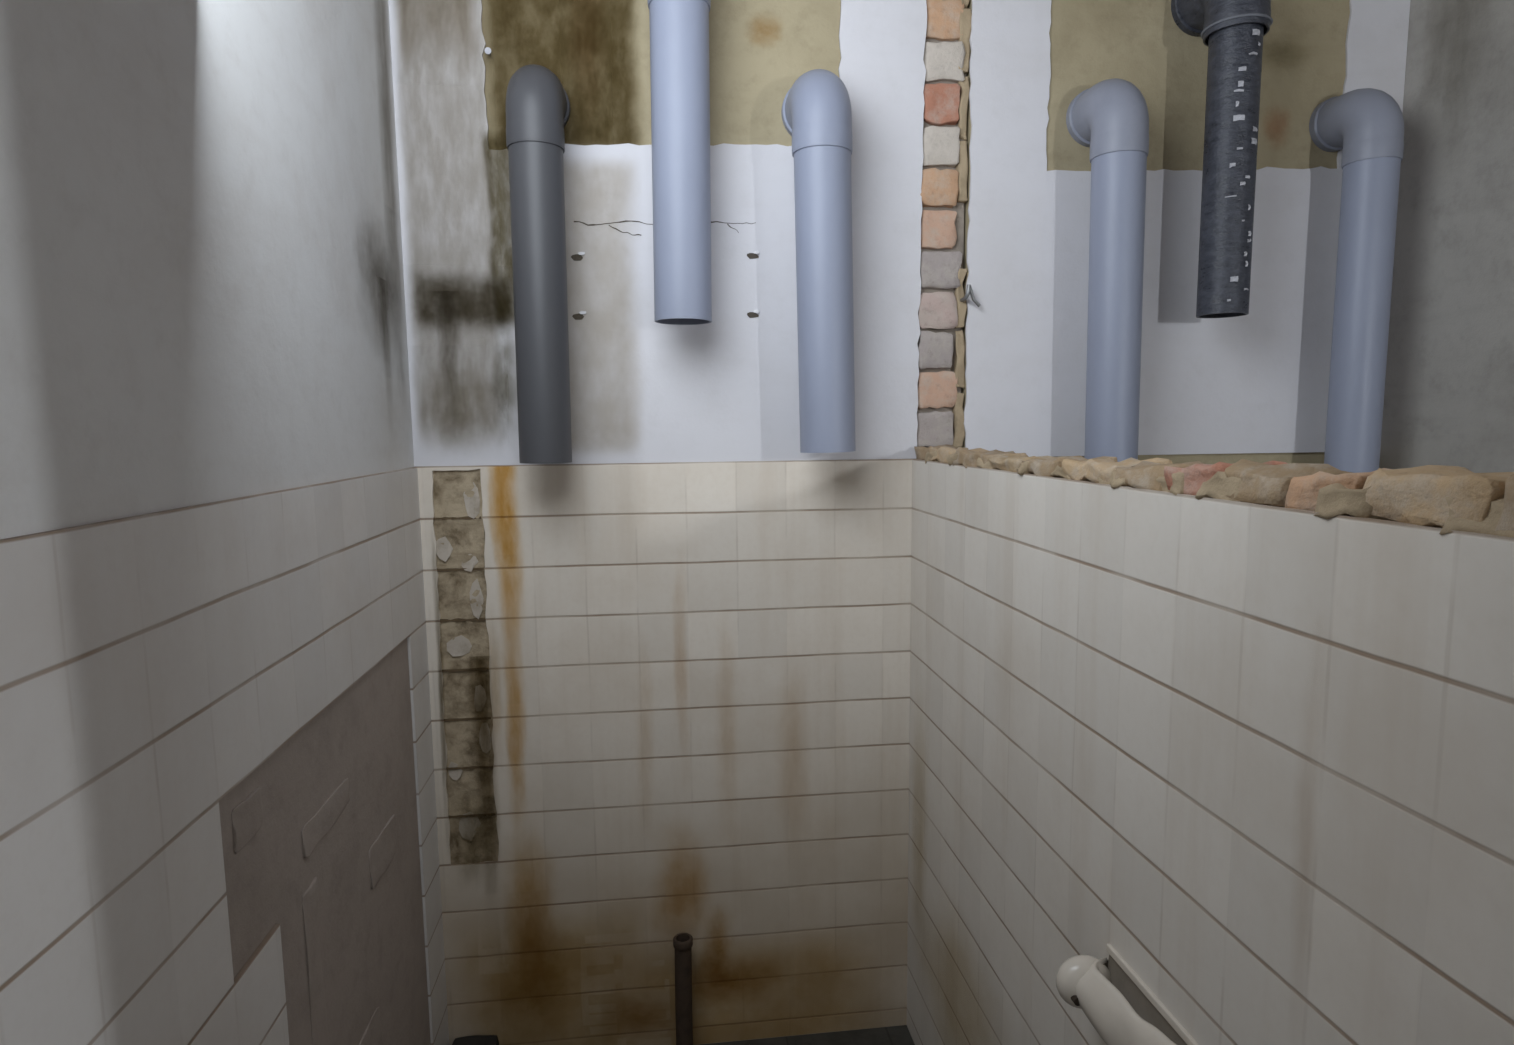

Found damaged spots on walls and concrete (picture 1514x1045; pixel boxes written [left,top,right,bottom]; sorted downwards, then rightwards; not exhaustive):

leakage [422,143,513,320]
spalling [914,0,1514,538]
spalling [433,469,499,865]